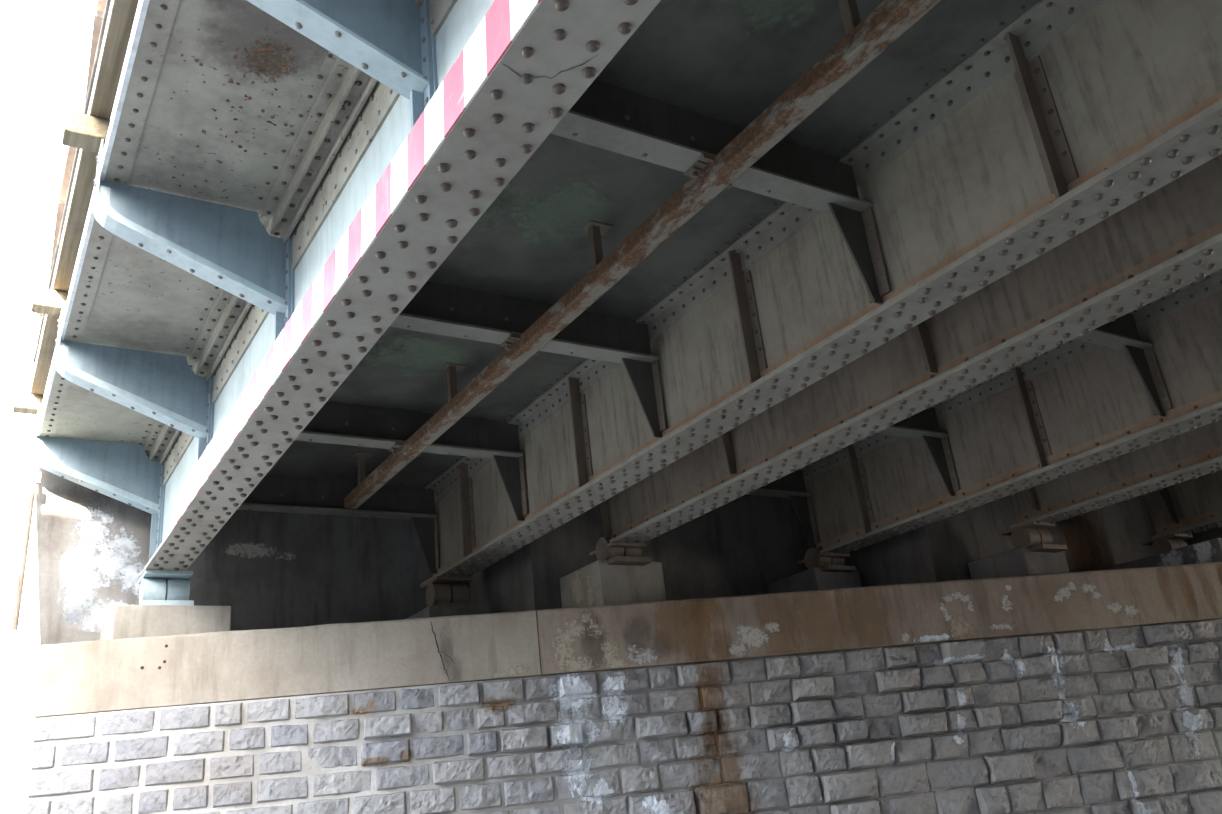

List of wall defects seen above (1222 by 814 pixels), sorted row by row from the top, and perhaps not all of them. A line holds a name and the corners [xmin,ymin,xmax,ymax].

crack [430,621,454,681]
damp [550,673,629,805]
corrosion [661,600,750,814]
damp [780,730,799,752]
damp [933,653,985,666]
damp [952,687,967,745]
damp [1000,652,1026,677]
damp [1042,646,1086,729]
damp [1103,638,1140,654]
damp [1169,639,1204,757]
damp [642,794,691,814]